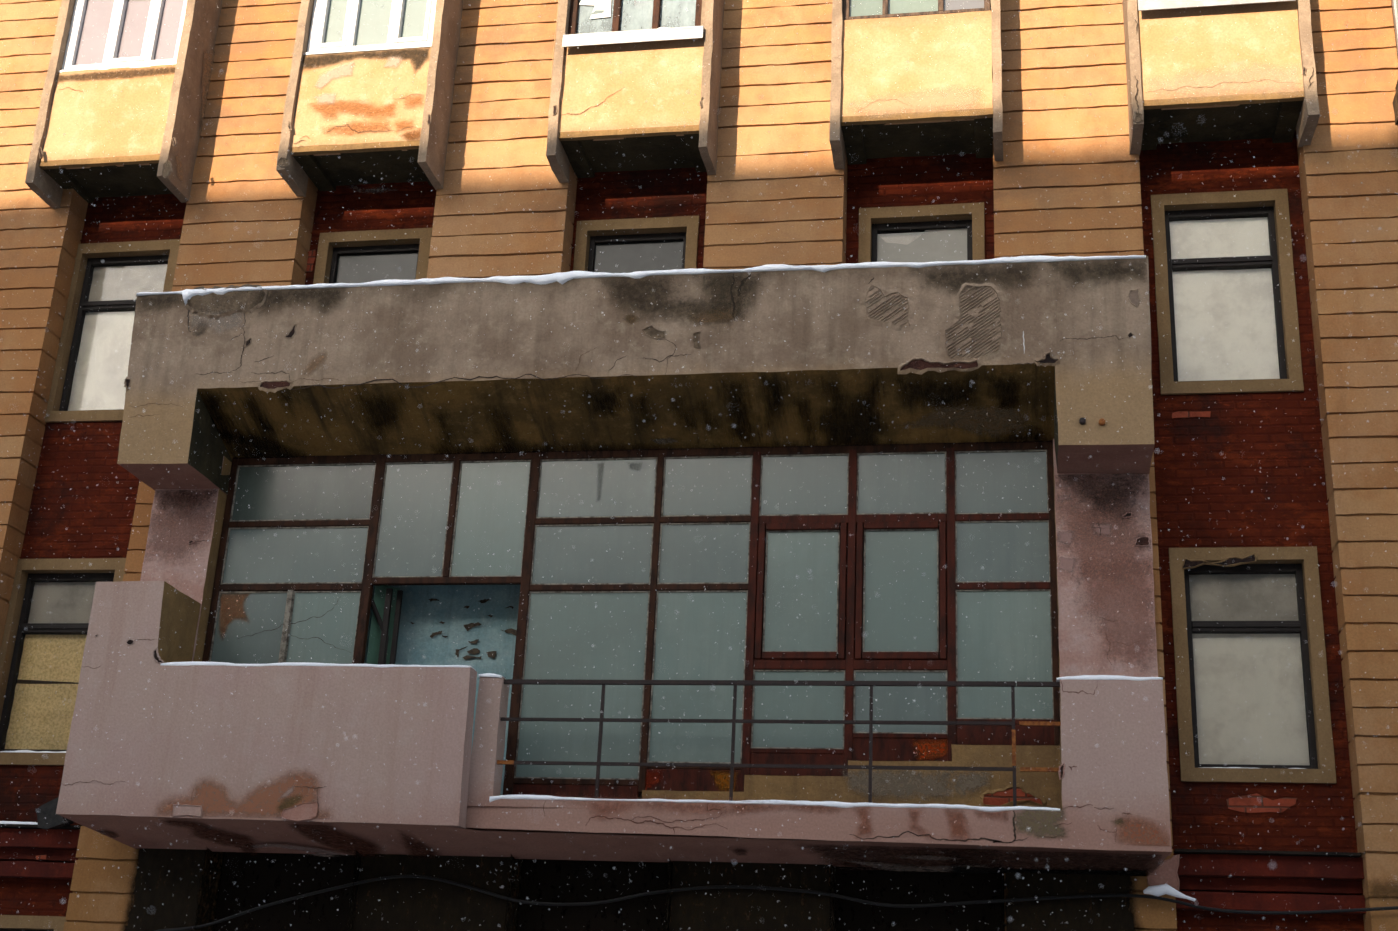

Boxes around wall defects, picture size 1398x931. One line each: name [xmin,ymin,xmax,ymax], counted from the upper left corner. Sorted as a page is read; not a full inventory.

peeling [316,62,353,103]
crack [199,313,691,390]
peeling [898,281,1007,375]
damp [698,381,881,449]
damp [900,378,1047,444]
damp [437,413,676,500]
rust [914,740,948,761]
peeling [173,804,203,818]
peeling [281,802,319,822]